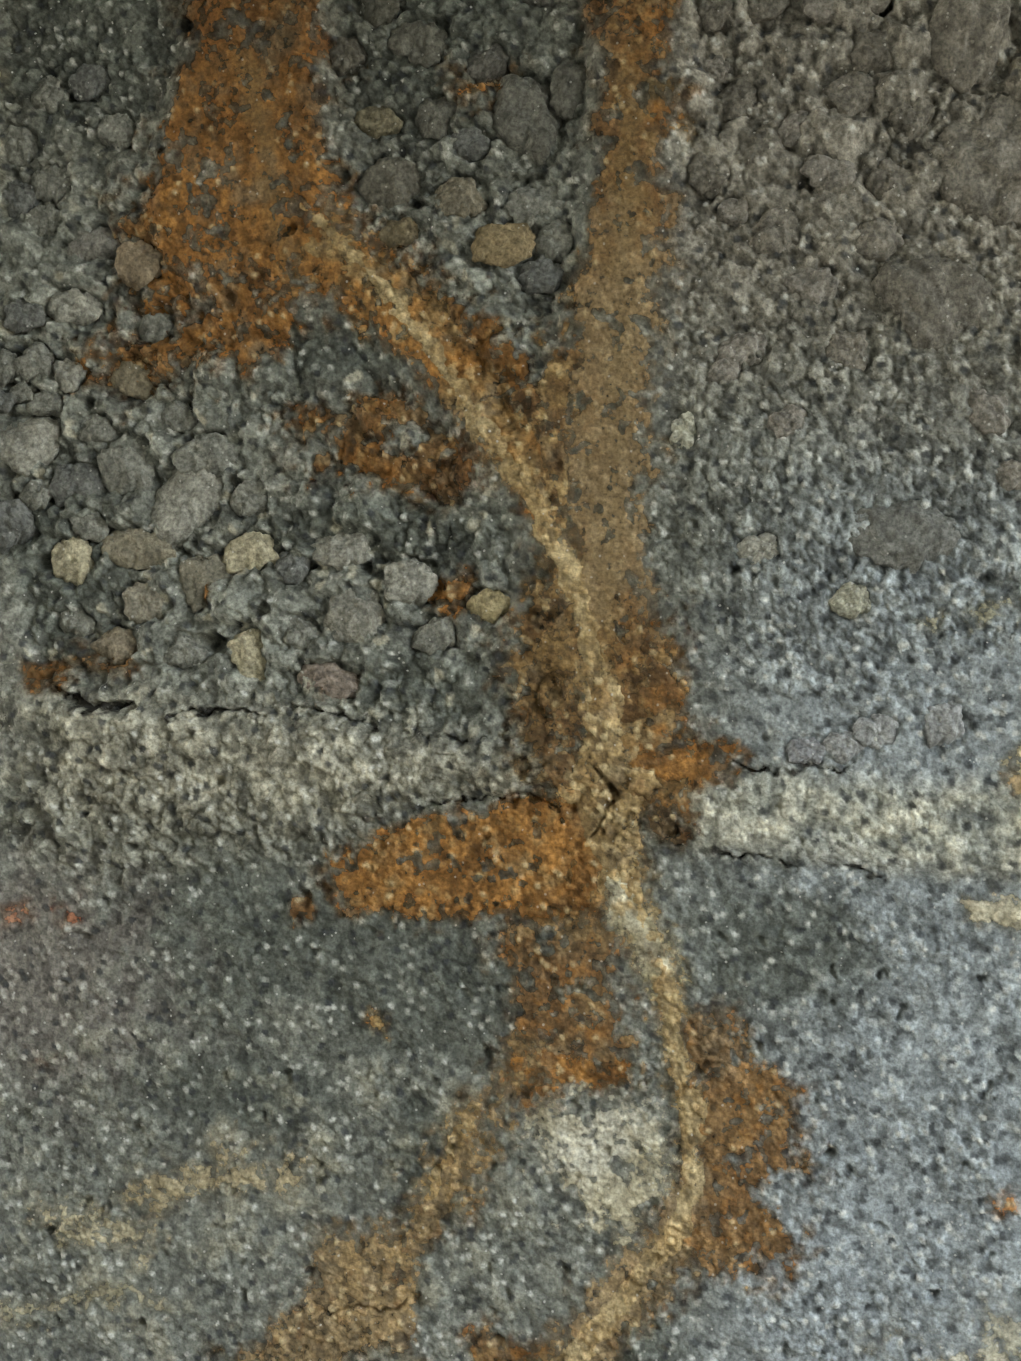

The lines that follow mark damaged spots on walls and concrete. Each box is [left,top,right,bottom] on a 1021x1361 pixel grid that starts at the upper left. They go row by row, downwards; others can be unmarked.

rust [70,0,755,1116]
crack [60,687,133,715]
crack [164,707,258,724]
crack [298,203,709,1361]
crack [733,760,854,777]
crack [710,845,792,868]
crack [844,864,886,882]
rust [647,1002,823,1320]
rust [458,1319,556,1361]